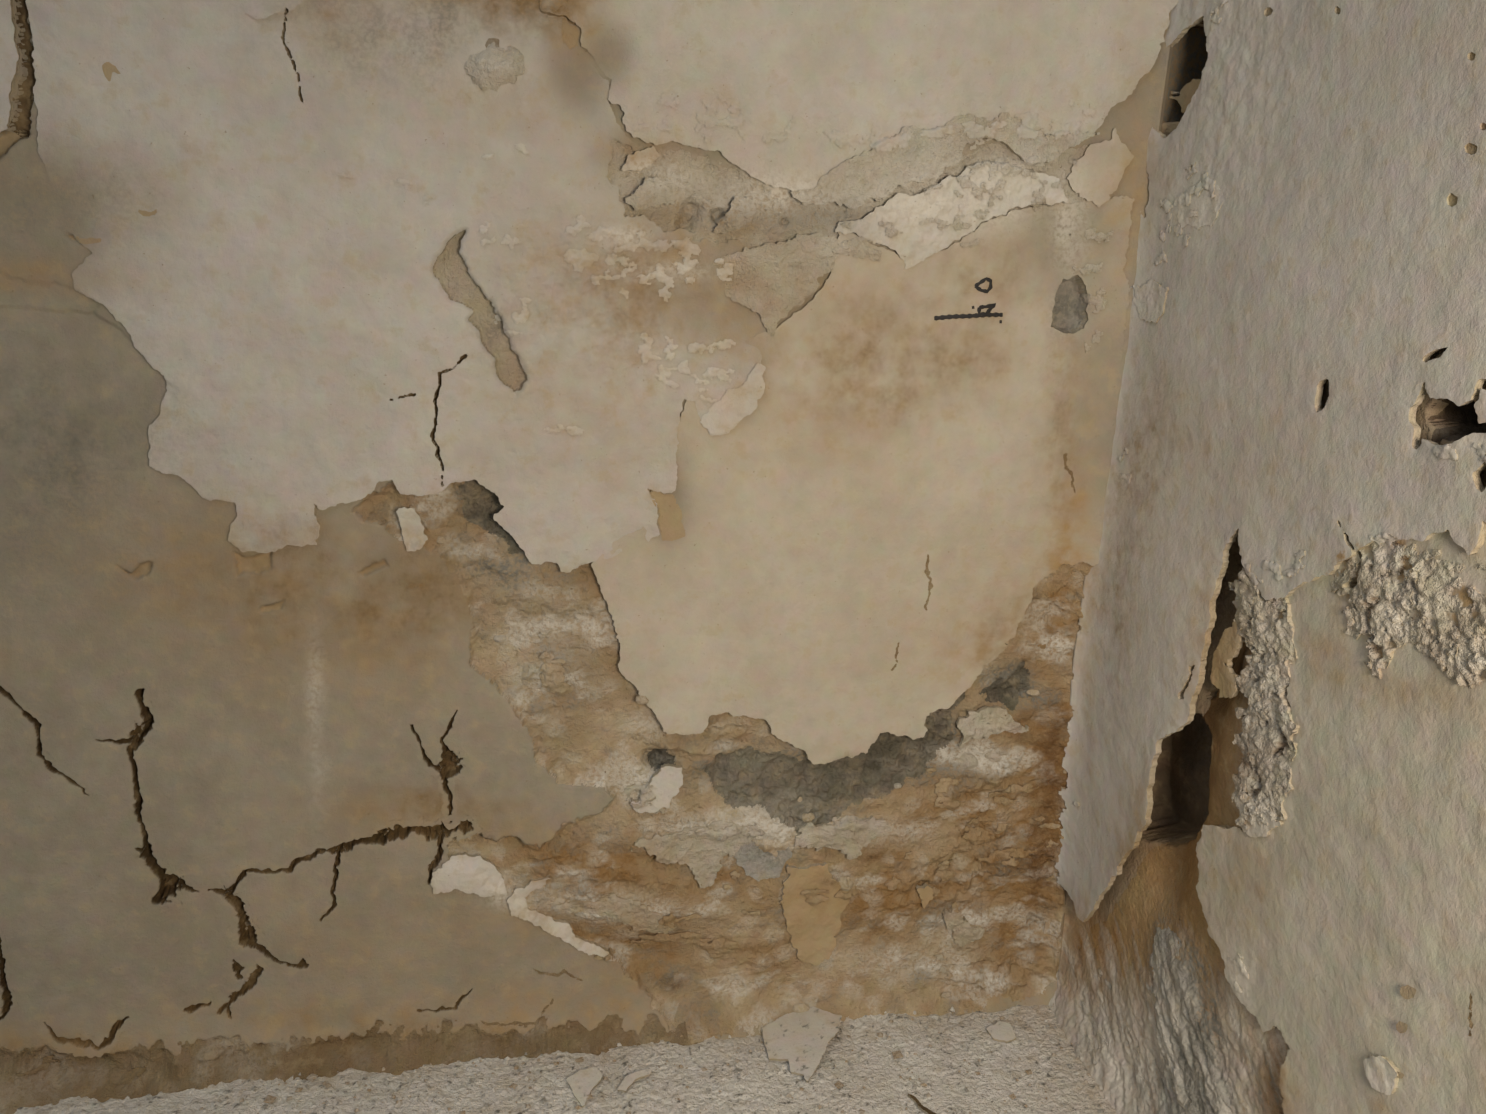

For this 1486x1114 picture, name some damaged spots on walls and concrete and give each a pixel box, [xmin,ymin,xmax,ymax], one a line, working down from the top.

crack [9,0,36,139]
crack [281,8,303,102]
crack [390,354,467,482]
peeling [0,0,1169,1114]
peeling [539,0,1486,1114]
crack [0,681,482,1027]
crack [0,929,137,1058]